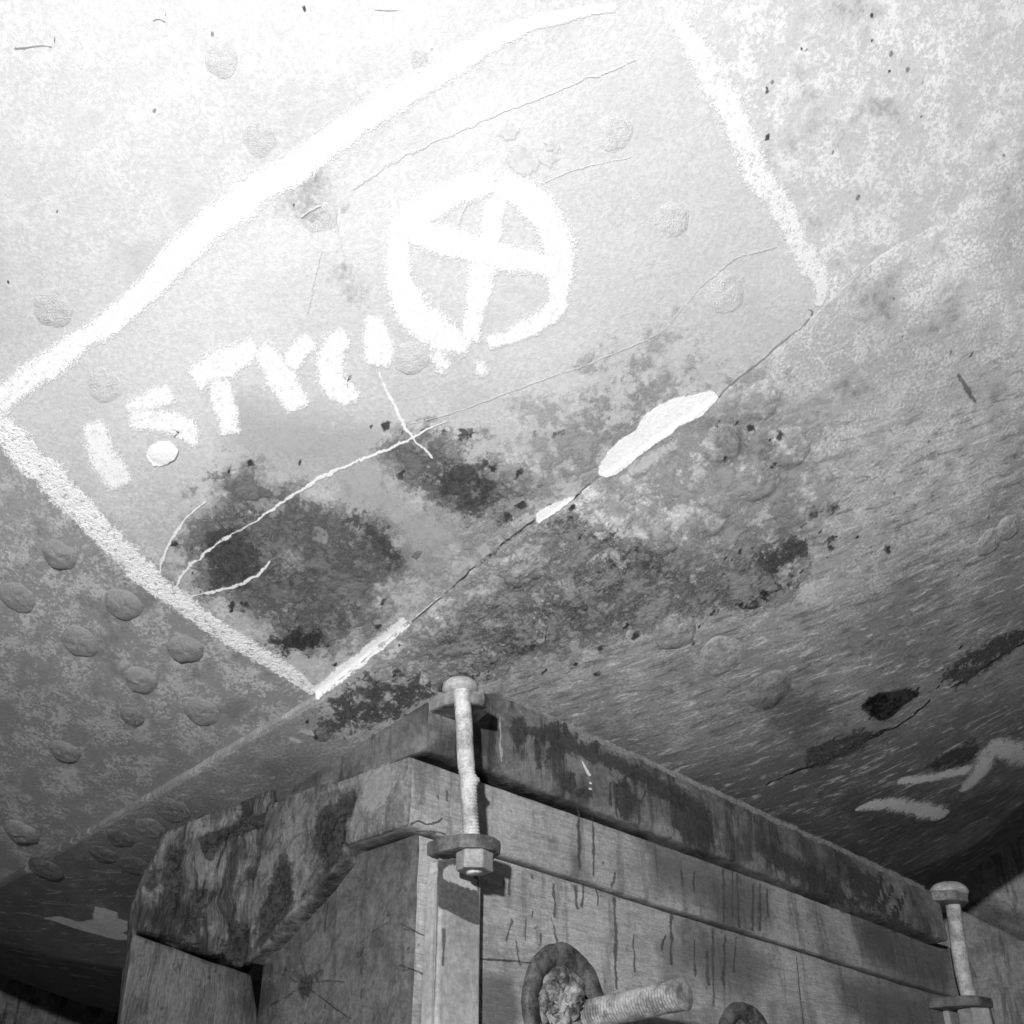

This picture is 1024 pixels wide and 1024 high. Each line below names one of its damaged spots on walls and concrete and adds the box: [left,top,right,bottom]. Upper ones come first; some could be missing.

crack [412,520,535,622]
crack [765,642,1024,786]
peeling [46,906,128,940]